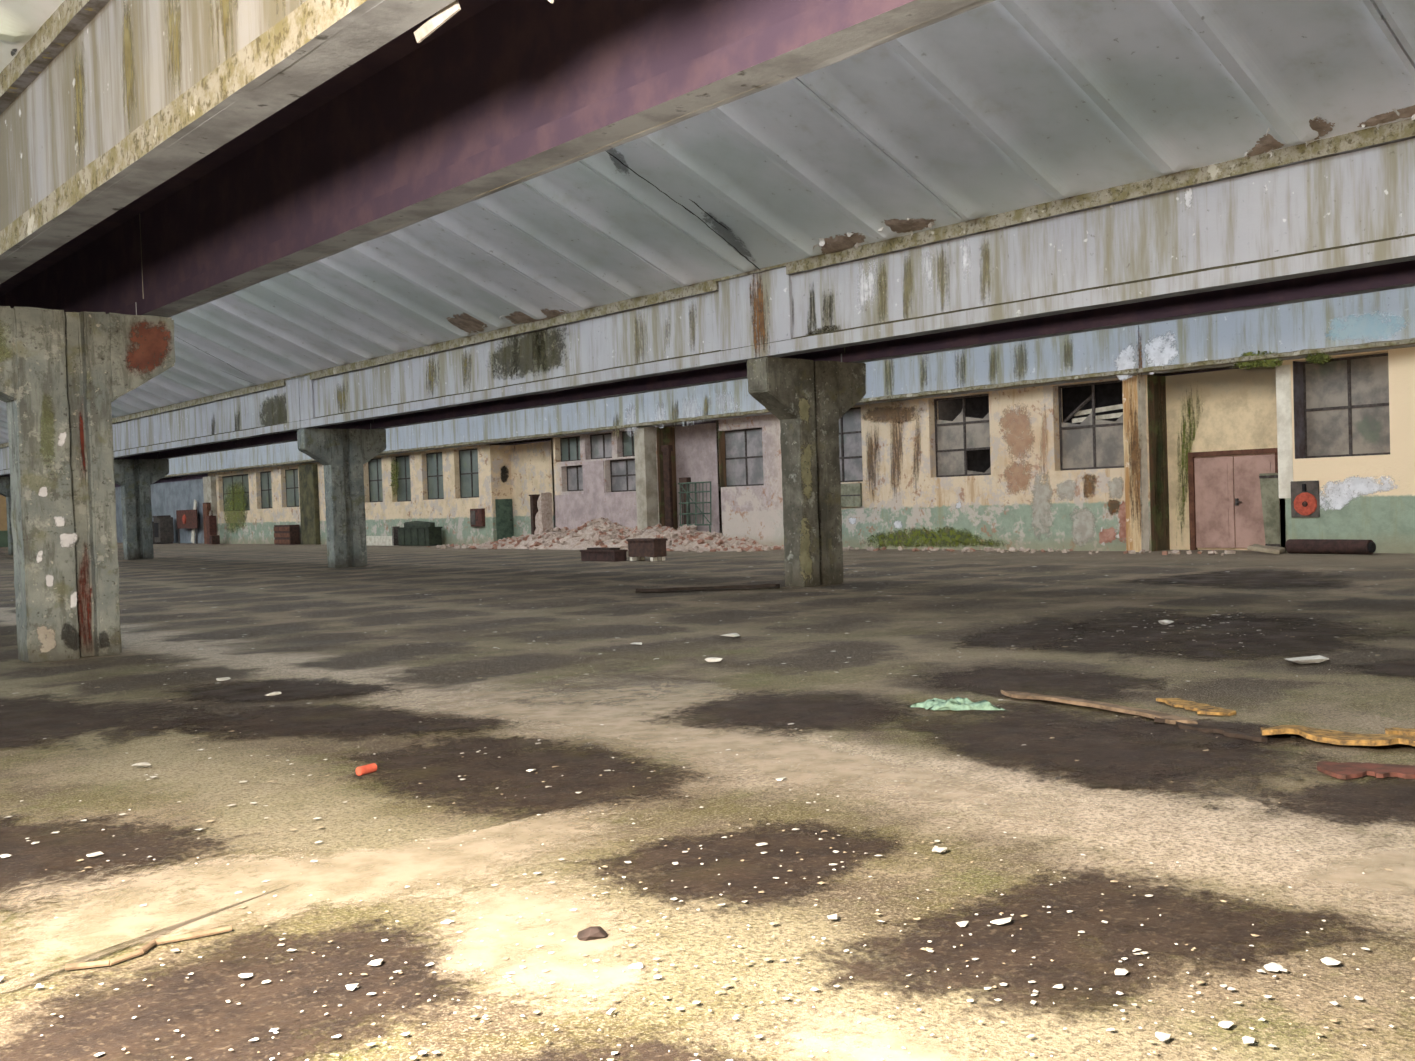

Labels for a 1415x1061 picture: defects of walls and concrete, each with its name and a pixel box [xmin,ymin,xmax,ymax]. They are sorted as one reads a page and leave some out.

water stain [122,4,135,119]
water stain [166,0,181,88]
spalling [1306,115,1335,147]
spalling [1357,105,1415,129]
spalling [813,218,936,255]
water stain [903,239,990,317]
rust [750,275,768,357]
rust [125,321,171,374]
water stain [989,345,1027,380]
peeling [1114,331,1178,380]
water stain [862,360,921,494]
peeling [1319,476,1397,511]